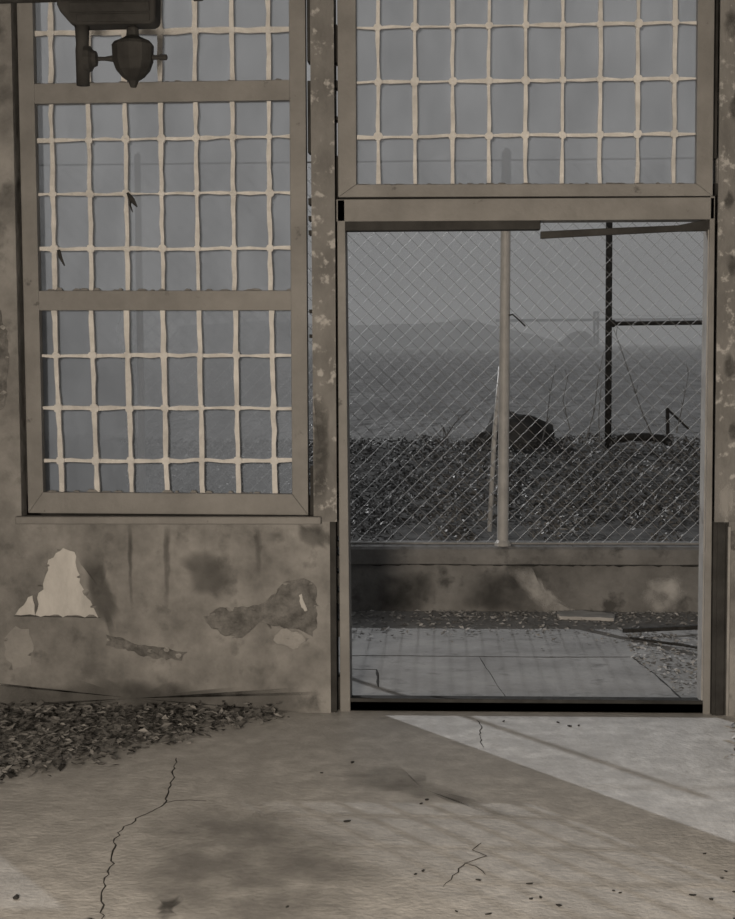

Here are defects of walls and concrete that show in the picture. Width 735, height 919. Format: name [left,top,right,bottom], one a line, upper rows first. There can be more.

peeling [4,548,101,670]
crack [100,759,205,919]